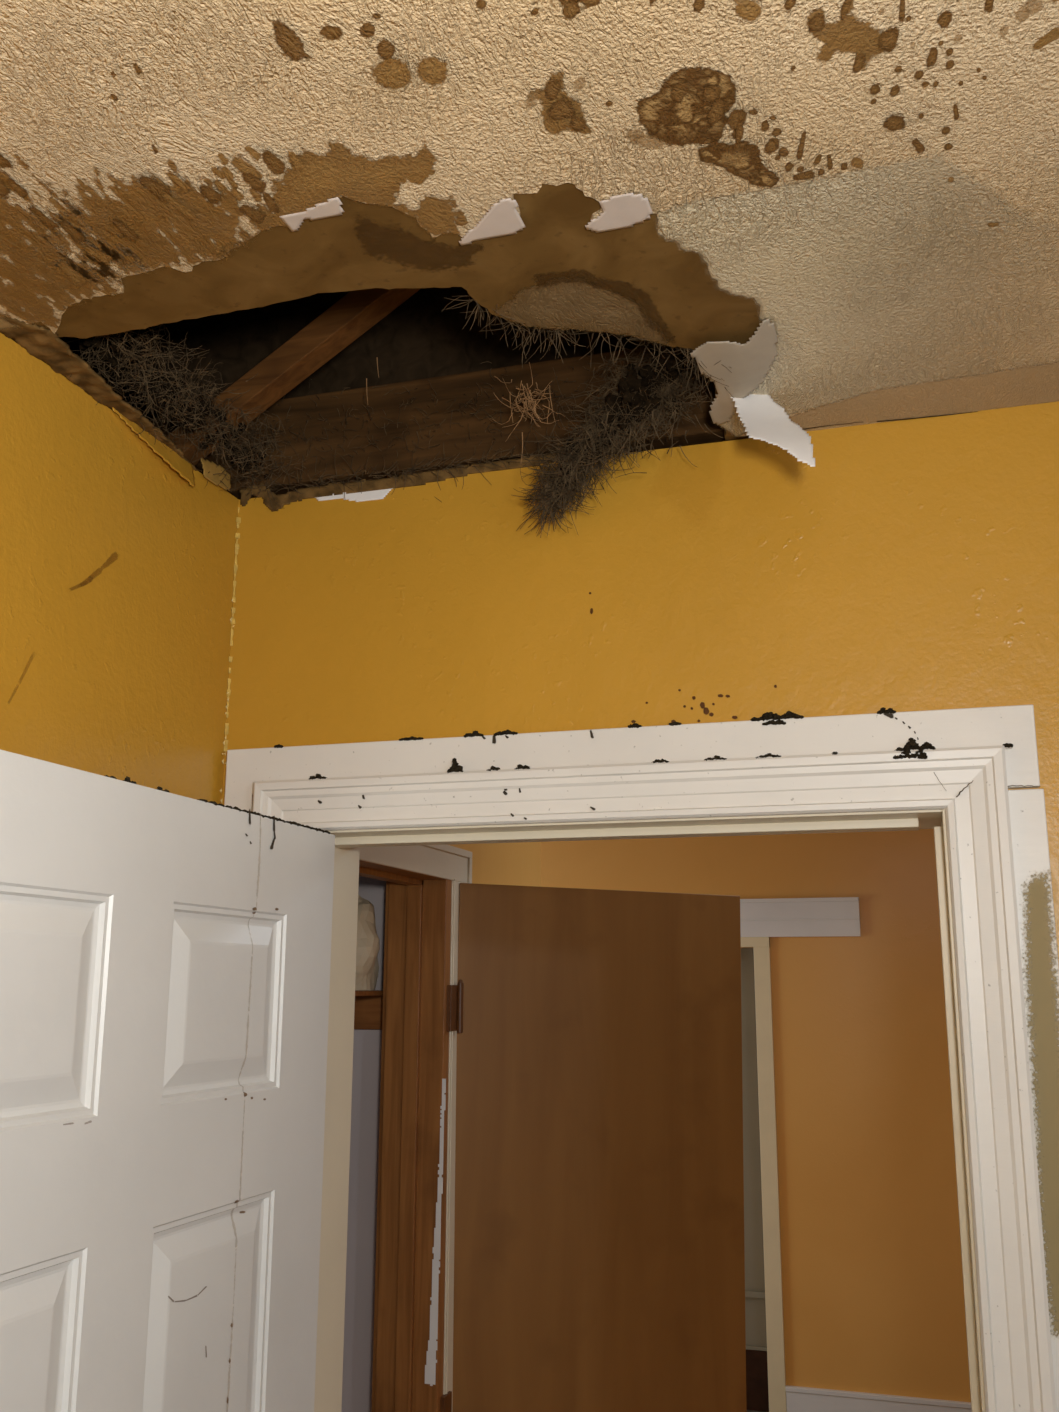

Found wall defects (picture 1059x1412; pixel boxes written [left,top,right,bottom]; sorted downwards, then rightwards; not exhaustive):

water stain [272,20,311,61]
water stain [320,25,343,40]
water stain [360,13,448,89]
water stain [559,0,600,19]
water stain [734,0,762,21]
water stain [807,0,963,104]
water stain [1033,27,1059,49]
water stain [529,72,591,134]
water stain [628,66,864,188]
water stain [883,113,925,153]
water stain [942,104,960,150]
spalling [0,183,815,765]